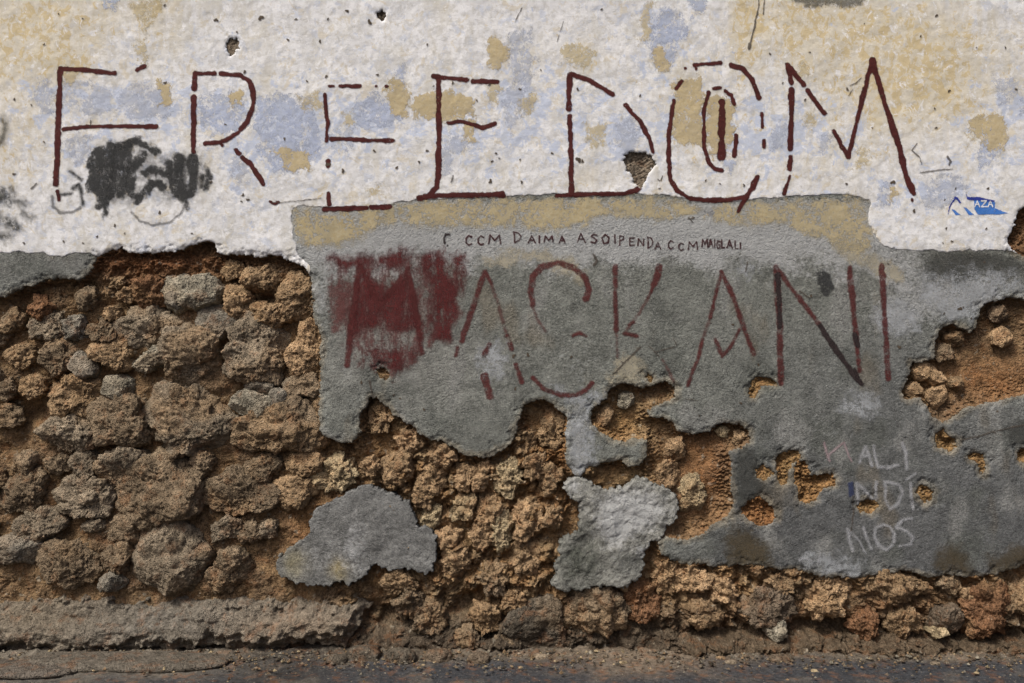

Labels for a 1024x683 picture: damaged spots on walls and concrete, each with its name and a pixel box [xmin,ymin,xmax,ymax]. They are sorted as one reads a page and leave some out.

peeling [293,118,873,254]
spalling [934,429,957,452]
spalling [755,450,836,504]
spalling [967,452,986,474]
spalling [741,496,776,526]